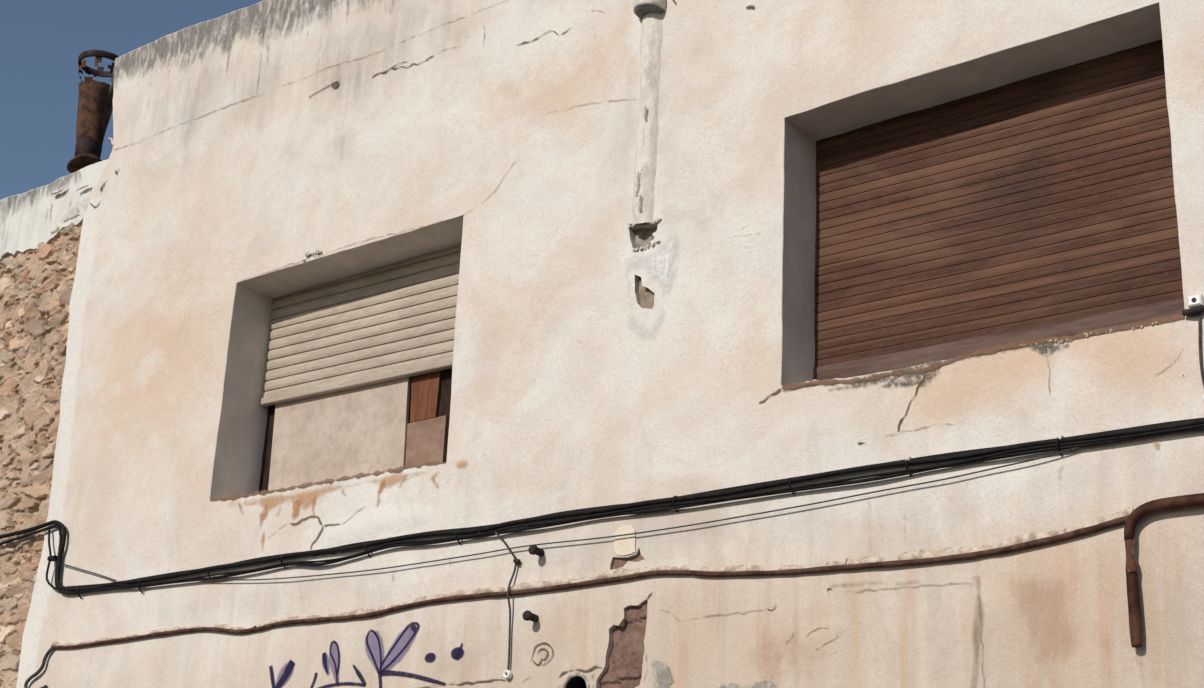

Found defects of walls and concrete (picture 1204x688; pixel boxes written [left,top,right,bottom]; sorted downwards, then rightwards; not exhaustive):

damp [110,0,364,87]
crack [371,53,435,78]
crack [516,27,571,46]
spalling [628,217,675,335]
crack [759,378,843,403]
crack [897,375,925,431]
flaking render [0,218,84,688]
corrosion [260,487,337,543]
crack [210,461,445,550]
corrosion [378,475,406,501]
peeling [531,642,553,666]
spalling [590,599,674,688]